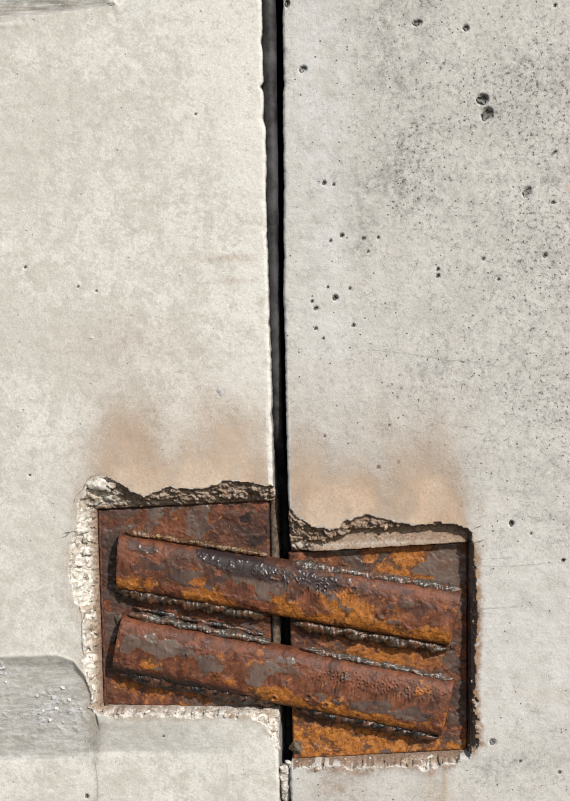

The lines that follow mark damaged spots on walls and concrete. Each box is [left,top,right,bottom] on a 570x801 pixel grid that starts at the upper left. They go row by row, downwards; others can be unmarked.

spalling [0,476,281,750]
corrosion [94,417,268,496]
corrosion [290,446,467,529]
spalling [288,501,480,772]